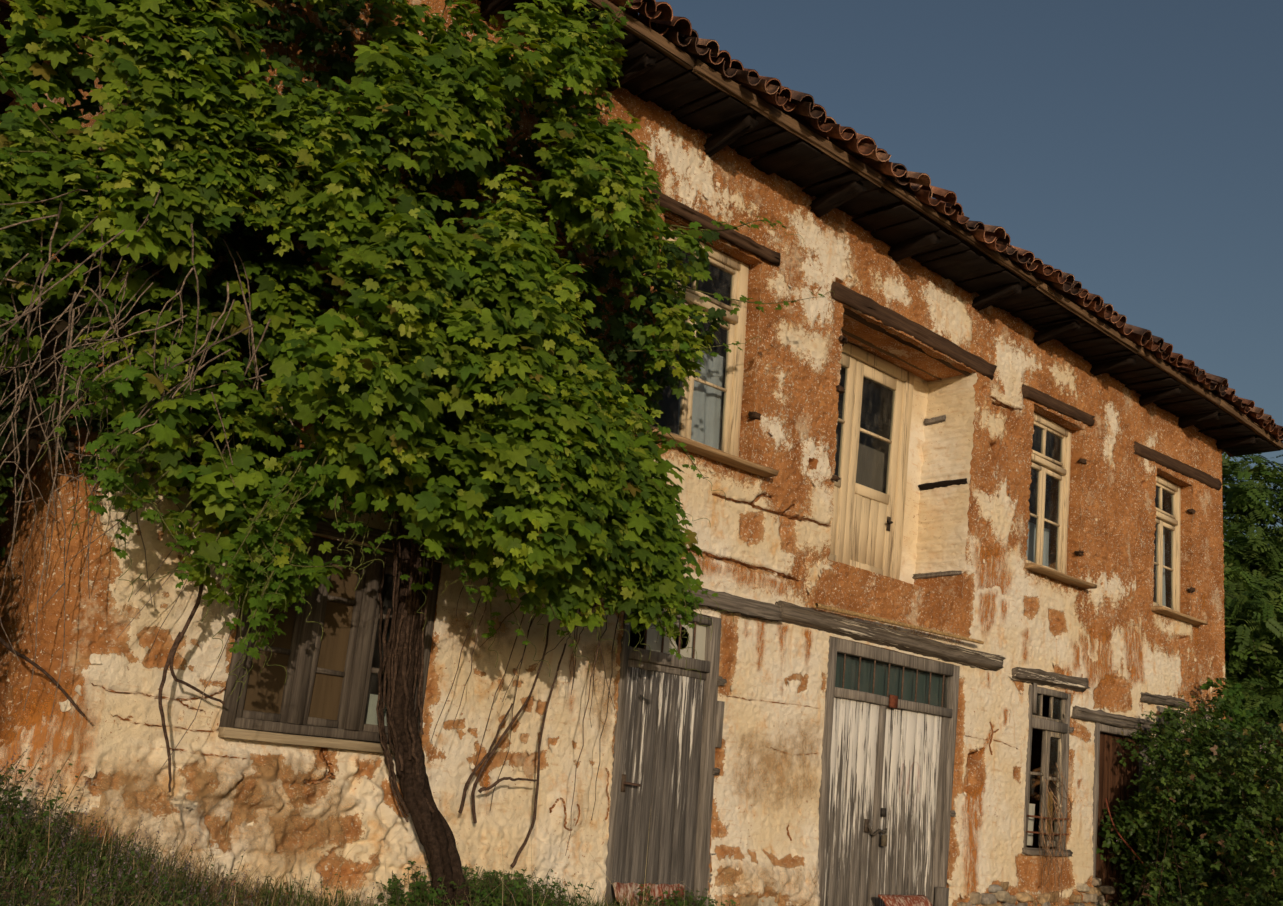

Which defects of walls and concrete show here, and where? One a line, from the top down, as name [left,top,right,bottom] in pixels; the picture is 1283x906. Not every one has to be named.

flaking render [0,60,130,129]
flaking render [237,0,544,124]
flaking render [51,222,352,326]
flaking render [196,342,333,461]
flaking render [368,75,1225,719]
spalling [0,285,242,771]
spalling [83,761,220,820]
spalling [204,747,380,892]
spalling [355,758,409,818]
spalling [711,738,806,906]
spalling [947,675,1094,906]